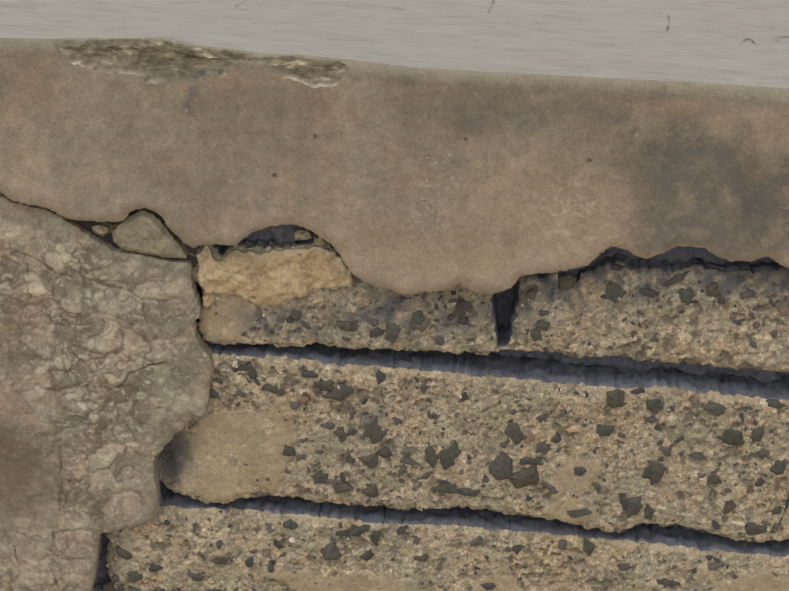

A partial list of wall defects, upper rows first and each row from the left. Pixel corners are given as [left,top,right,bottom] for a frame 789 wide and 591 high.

spalling [43,38,351,88]
damp [638,126,789,252]
spalling [91,208,789,591]